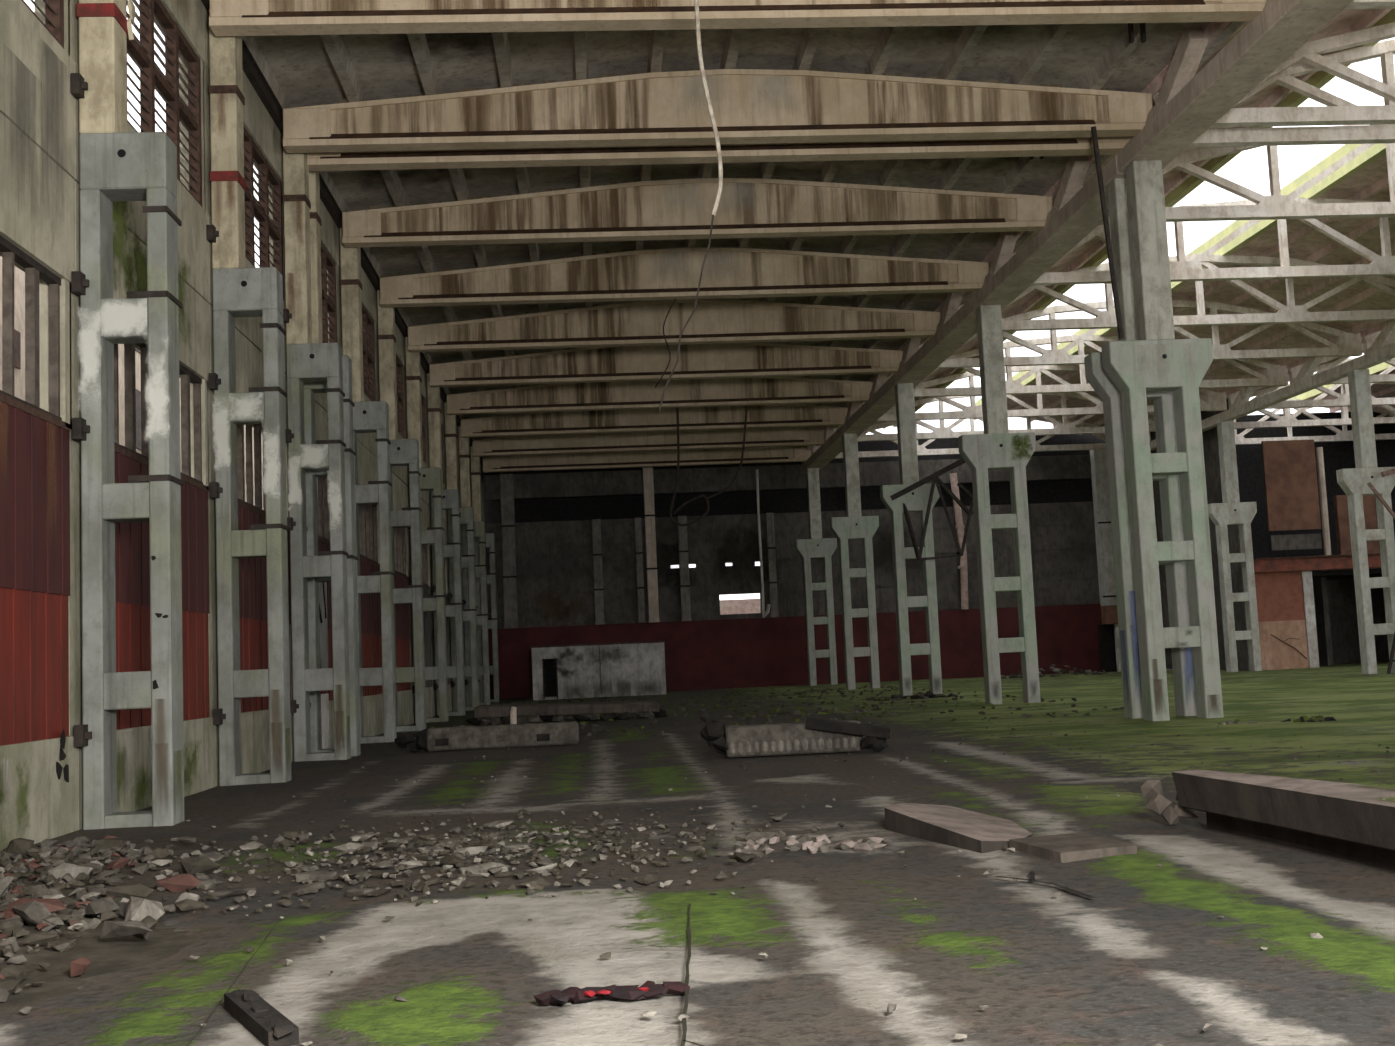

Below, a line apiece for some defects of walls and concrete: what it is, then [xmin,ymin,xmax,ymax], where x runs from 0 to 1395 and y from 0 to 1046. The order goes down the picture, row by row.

damp [463,83,532,131]
damp [596,76,615,129]
damp [1029,84,1076,121]
damp [113,201,147,291]
peeling [79,299,147,391]
peeling [213,393,262,468]
crack [624,904,704,1046]